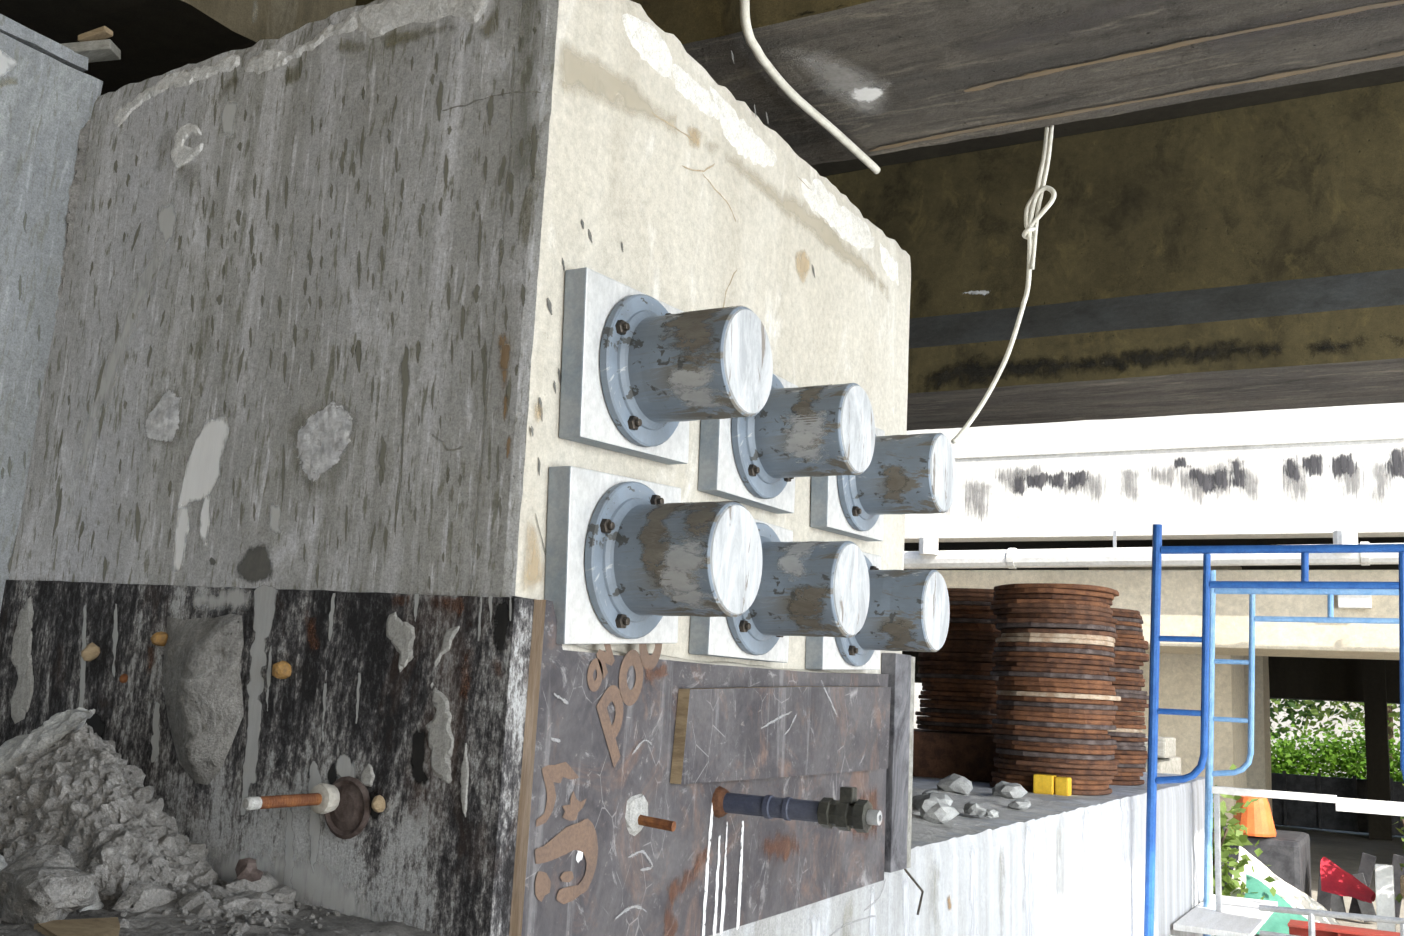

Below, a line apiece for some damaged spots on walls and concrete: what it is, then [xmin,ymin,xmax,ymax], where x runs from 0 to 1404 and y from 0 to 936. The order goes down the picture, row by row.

peeling [112,0,489,127]
peeling [622,13,777,168]
peeling [801,178,899,286]
damp [926,341,1281,391]
peeling [10,596,34,724]
damp [78,605,87,708]
damp [151,702,160,763]
damp [195,545,278,816]
damp [303,544,335,742]
damp [308,754,355,793]
peeling [386,612,415,672]
peeling [426,626,469,817]